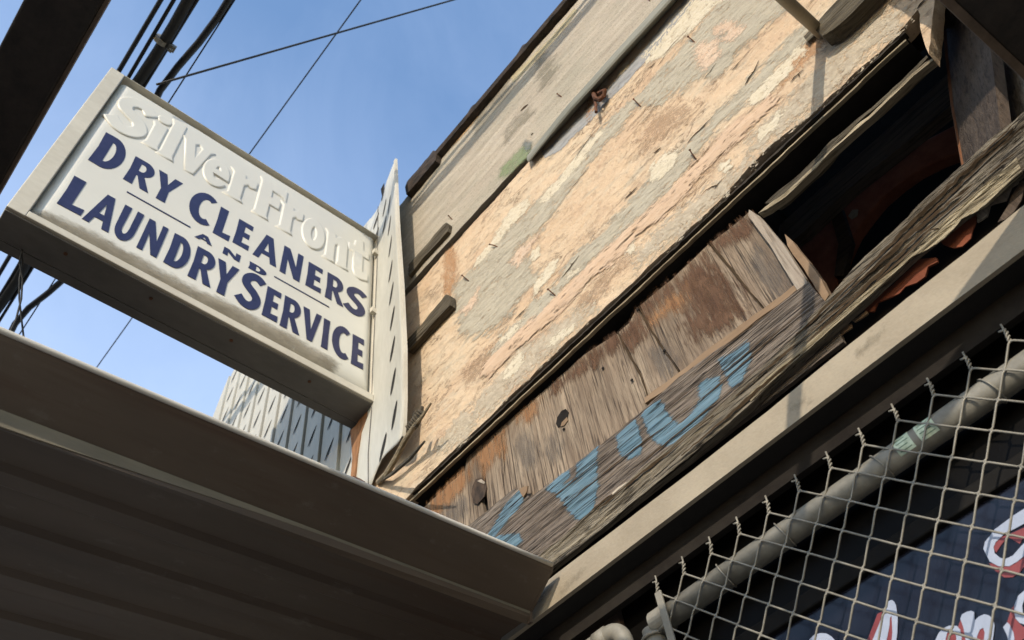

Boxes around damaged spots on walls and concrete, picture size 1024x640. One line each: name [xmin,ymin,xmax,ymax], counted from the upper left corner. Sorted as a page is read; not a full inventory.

peeling [436,0,916,456]